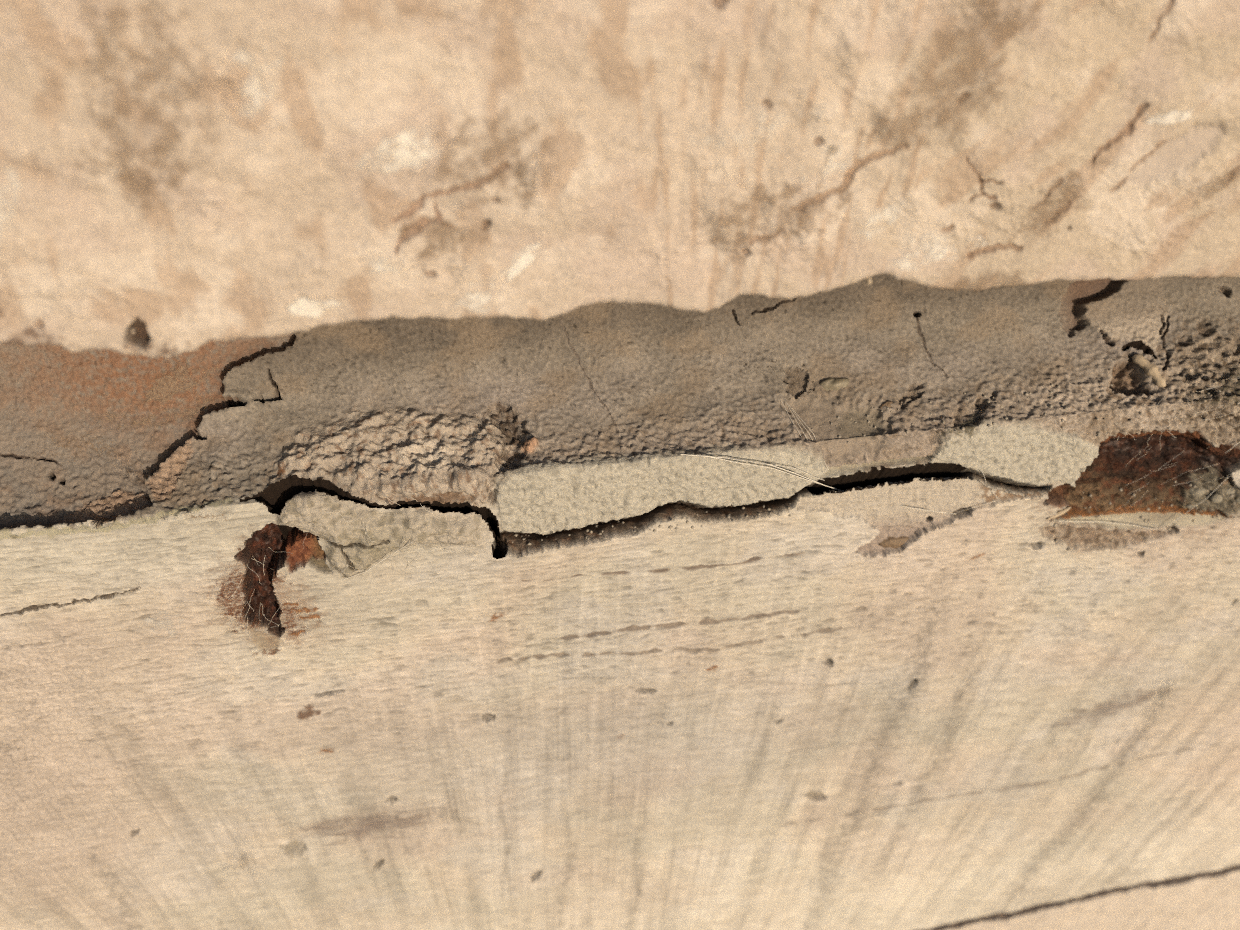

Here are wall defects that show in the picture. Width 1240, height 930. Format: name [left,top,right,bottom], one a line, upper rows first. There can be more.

spalling [781,277,1240,558]
corrosion [217,512,331,655]
crack [240,455,1053,571]
corrosion [1062,505,1231,536]